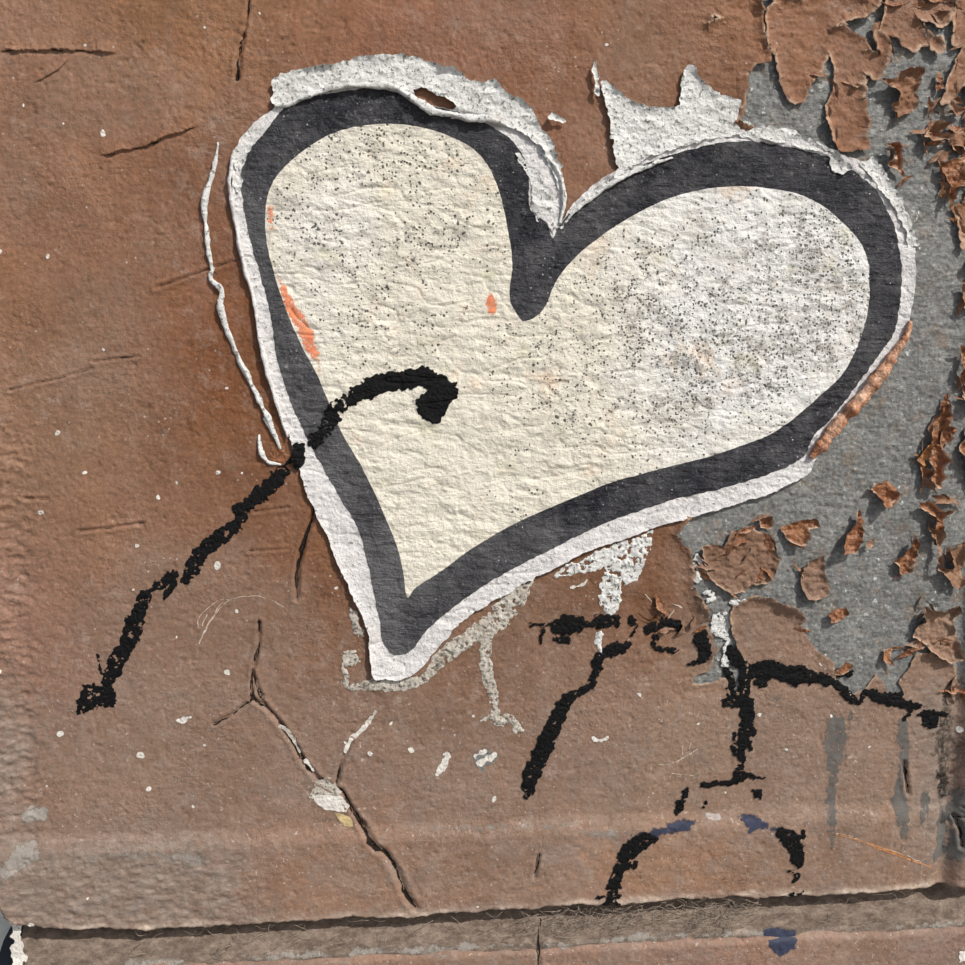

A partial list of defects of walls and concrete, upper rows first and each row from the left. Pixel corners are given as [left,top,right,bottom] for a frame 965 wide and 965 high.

crack [236,0,250,81]
peeling [638,0,965,760]
crack [294,507,315,598]
crack [212,620,416,907]
leakage [823,712,859,850]
leakage [891,691,965,863]